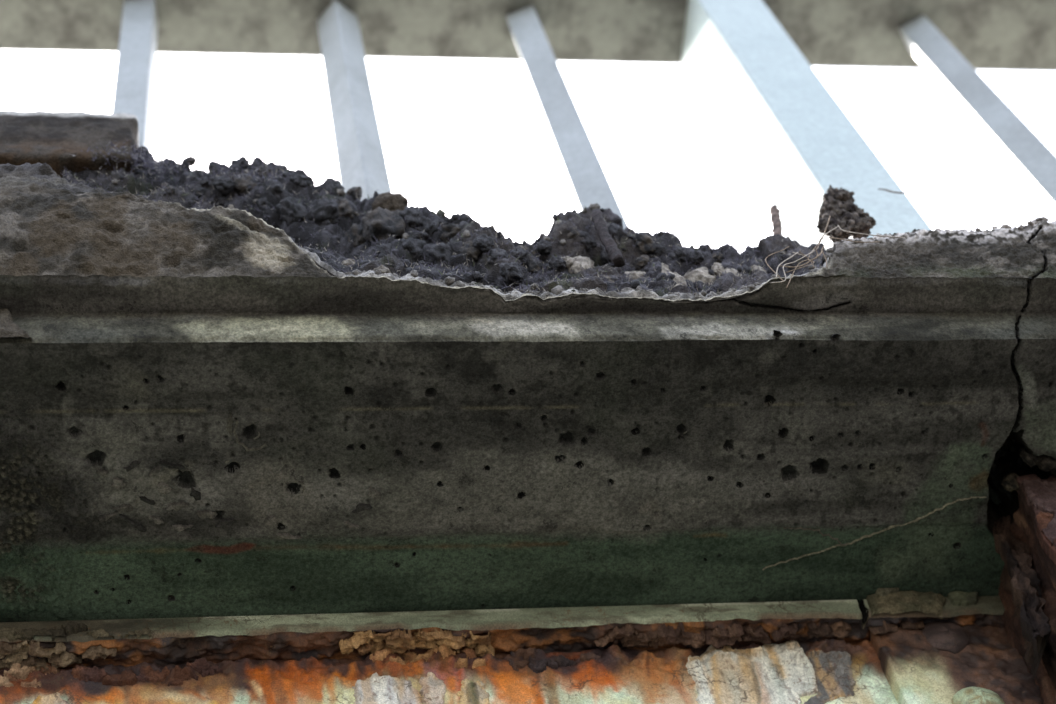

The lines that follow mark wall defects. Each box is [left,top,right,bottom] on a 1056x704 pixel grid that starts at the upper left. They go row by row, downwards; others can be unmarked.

spalling [63,146,850,303]
crack [722,299,850,311]
crack [1009,226,1047,434]
corrosion [1020,478,1056,548]
peeling [0,621,227,704]
corrosion [0,644,709,704]
peeling [339,628,495,704]
peeling [649,621,855,704]
corrosion [799,638,891,699]